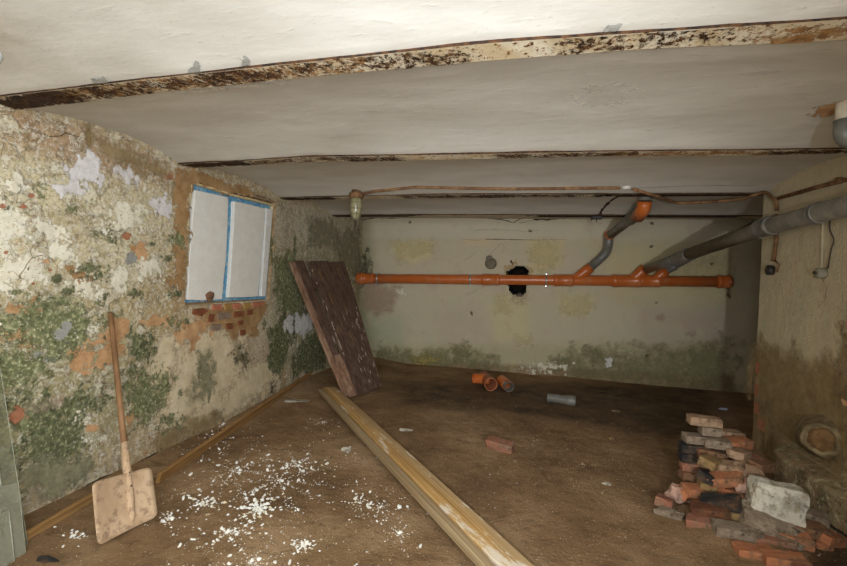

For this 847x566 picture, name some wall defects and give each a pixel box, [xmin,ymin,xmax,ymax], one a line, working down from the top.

rust [550,22,847,56]
rust [0,47,479,110]
peeling [52,149,142,199]
rust [179,156,406,168]
rust [491,149,847,159]
peeling [0,167,254,363]
spalling [503,259,534,275]
spalling [508,285,526,297]
peeling [51,301,282,438]
leakage [227,343,251,373]
leakage [519,354,575,376]
leakage [746,327,847,470]